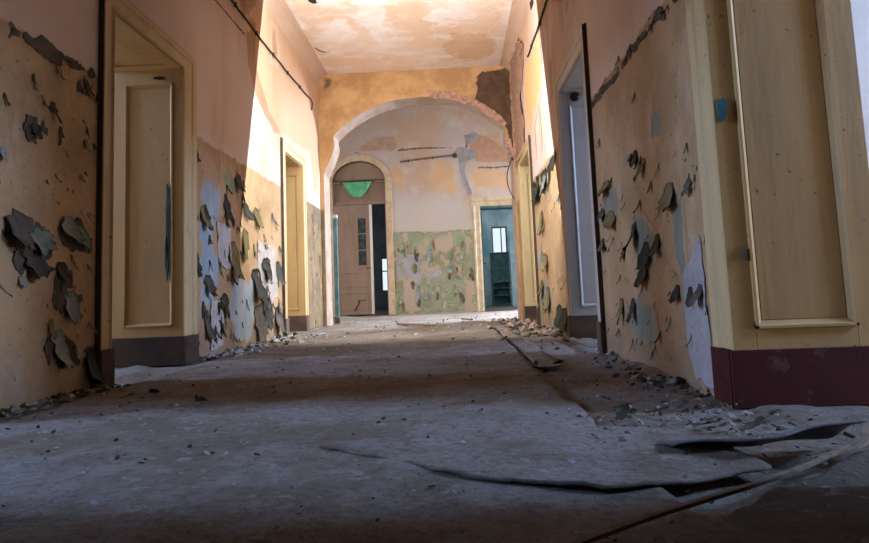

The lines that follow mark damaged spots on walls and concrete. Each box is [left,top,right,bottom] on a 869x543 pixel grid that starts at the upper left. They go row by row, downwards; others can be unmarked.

peeling [24,114,48,144]
peeling [8,21,100,105]
damp [292,0,513,202]
flaking render [427,26,542,174]
damp [546,45,555,116]
peeling [591,0,677,109]
peeling [3,208,106,389]
peeling [197,151,287,351]
peeling [307,201,327,330]
peeling [393,229,477,313]
peeling [531,150,568,332]
peeling [596,150,714,390]